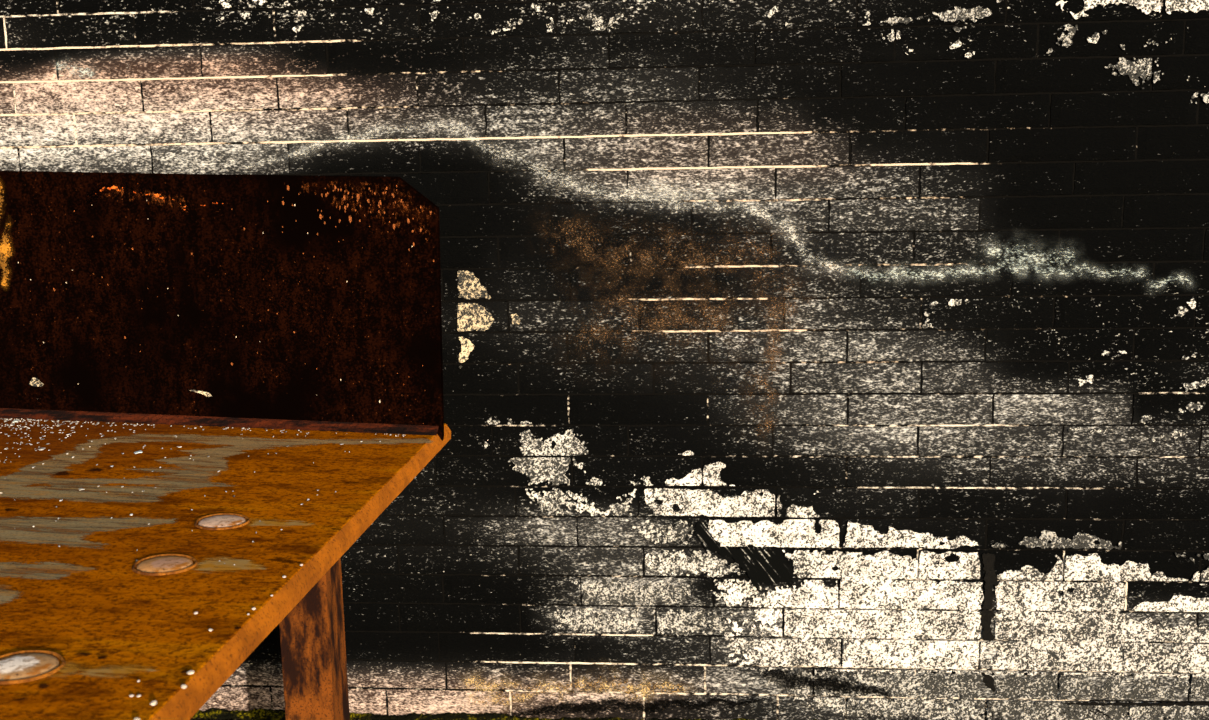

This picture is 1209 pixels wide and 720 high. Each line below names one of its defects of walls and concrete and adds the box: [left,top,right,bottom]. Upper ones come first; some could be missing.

peeling [862,0,1002,58]
peeling [1046,0,1209,54]
peeling [1105,38,1172,89]
rust [267,184,432,251]
leakage [427,123,838,270]
leakage [852,245,1140,279]
peeling [922,299,977,328]
peeling [1174,298,1196,317]
peeling [1179,379,1209,413]
peeling [487,416,1209,720]
leakage [980,553,998,641]
leakage [981,672,996,695]